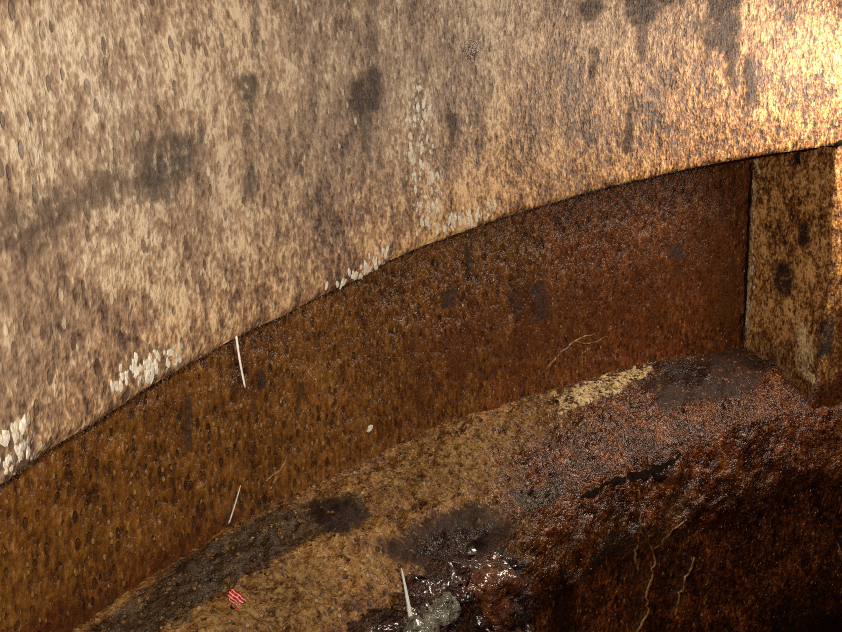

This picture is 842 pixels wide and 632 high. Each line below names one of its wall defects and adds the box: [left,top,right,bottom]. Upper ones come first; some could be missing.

leakage [582,0,604,22]
leakage [626,0,676,61]
leakage [701,0,755,105]
leakage [351,67,382,157]
leakage [405,75,500,236]
leakage [625,97,634,153]
efflorescence [110,348,182,393]
efflorescence [0,414,33,475]
leakage [313,498,369,533]
leakage [379,504,513,568]
crack [582,452,687,632]
crack [674,557,695,615]